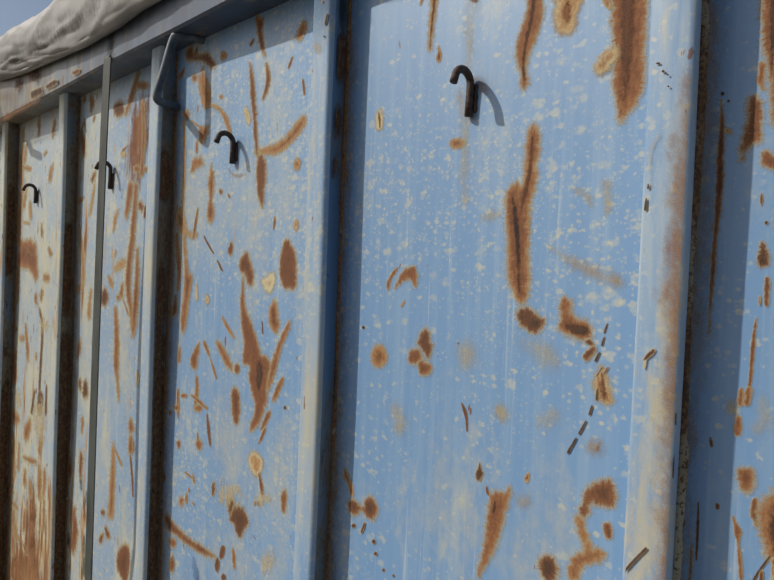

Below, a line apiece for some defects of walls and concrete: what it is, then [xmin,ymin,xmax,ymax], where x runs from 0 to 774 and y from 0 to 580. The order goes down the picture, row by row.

corrosion [515,0,584,90]
corrosion [593,0,649,124]
corrosion [6,127,50,315]
corrosion [62,71,150,401]
corrosion [148,110,298,580]
corrosion [504,122,546,335]
corrosion [558,295,597,361]
corrosion [707,0,774,333]
corrosion [54,333,89,580]
corrosion [475,462,512,578]
corrosion [538,477,617,580]
corrosion [737,467,774,580]